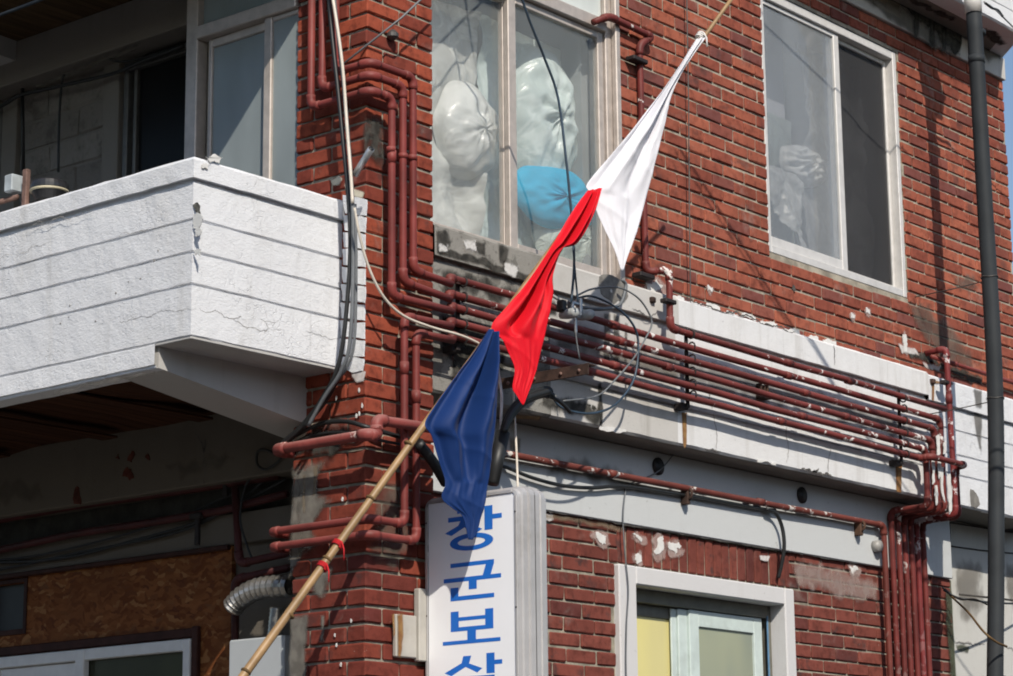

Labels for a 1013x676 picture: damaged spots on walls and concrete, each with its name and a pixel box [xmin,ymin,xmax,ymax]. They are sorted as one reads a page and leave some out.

crack [100,308,277,332]